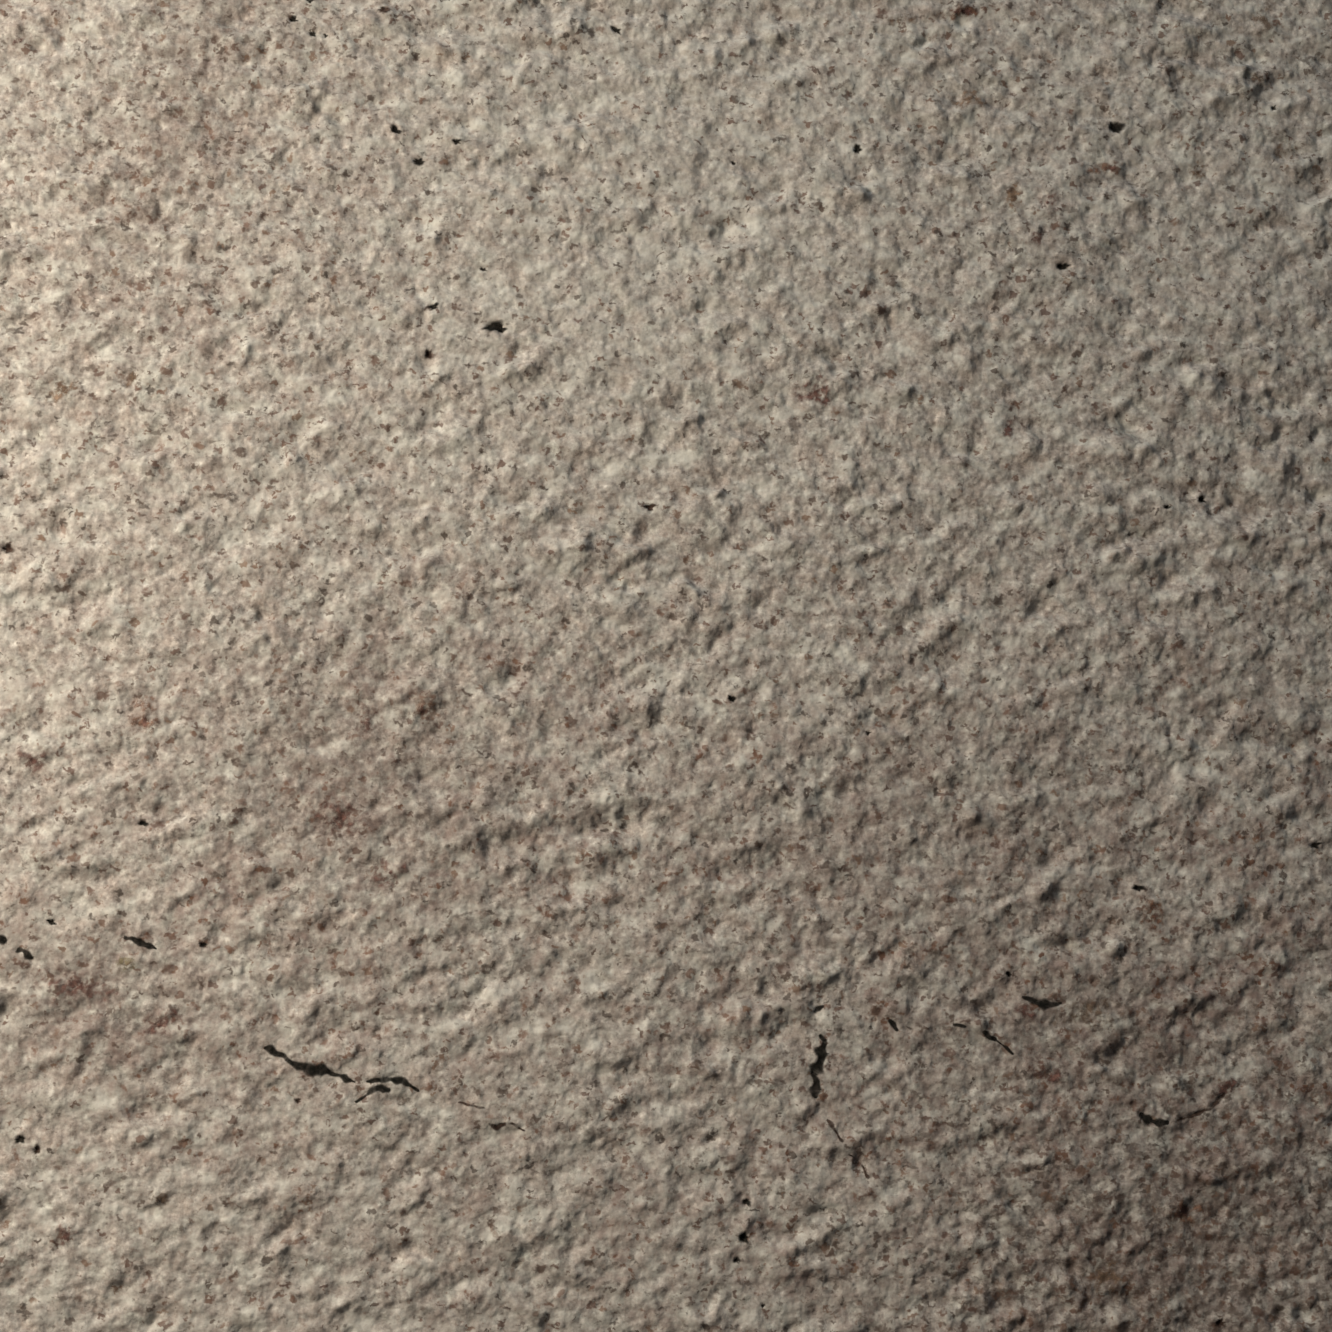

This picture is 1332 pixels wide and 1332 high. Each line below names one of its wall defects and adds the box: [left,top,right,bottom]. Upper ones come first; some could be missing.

crack [0,935,33,959]
crack [123,936,157,949]
crack [1022,996,1062,1009]
crack [888,1019,898,1031]
crack [953,1023,1014,1055]
crack [263,1045,419,1103]
crack [810,1005,870,1179]
crack [1139,1093,1225,1127]